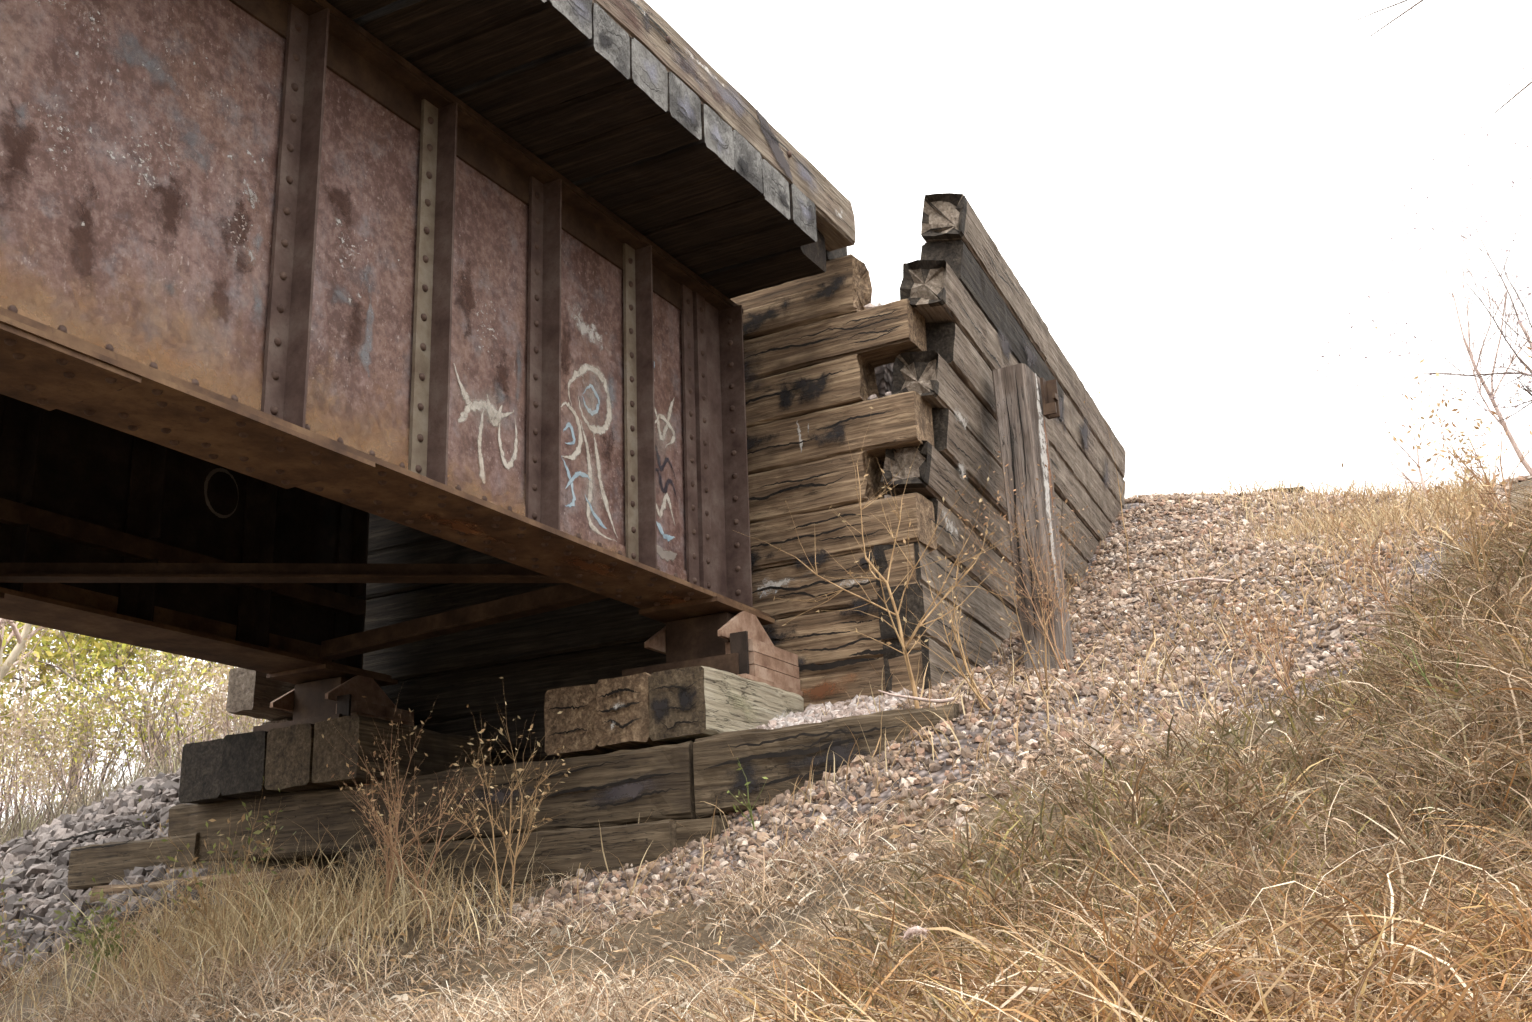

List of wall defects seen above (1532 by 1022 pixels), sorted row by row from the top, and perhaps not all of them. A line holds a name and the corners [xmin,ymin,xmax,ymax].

corrosion [0,106,35,181]
corrosion [70,187,97,276]
corrosion [153,177,182,232]
corrosion [221,200,251,271]
corrosion [326,189,352,226]
corrosion [0,272,262,411]
corrosion [348,298,362,360]
corrosion [457,263,475,334]
corrosion [496,352,509,396]
corrosion [305,387,408,469]